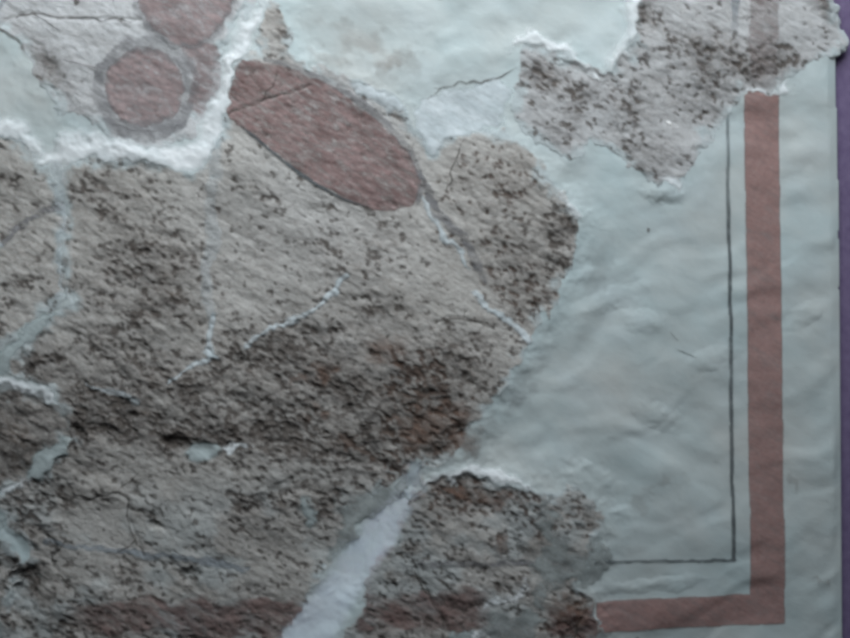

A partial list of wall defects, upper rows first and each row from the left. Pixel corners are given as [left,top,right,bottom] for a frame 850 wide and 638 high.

crack [20,12,130,28]
spalling [640,7,807,107]
spalling [520,63,641,130]
spalling [68,167,179,229]
spalling [475,152,530,253]
spalling [541,202,578,275]
spalling [0,275,49,330]
spalling [485,264,557,345]
spalling [66,228,503,541]
spalling [4,475,75,550]
spalling [396,478,585,629]
spalling [49,561,196,638]